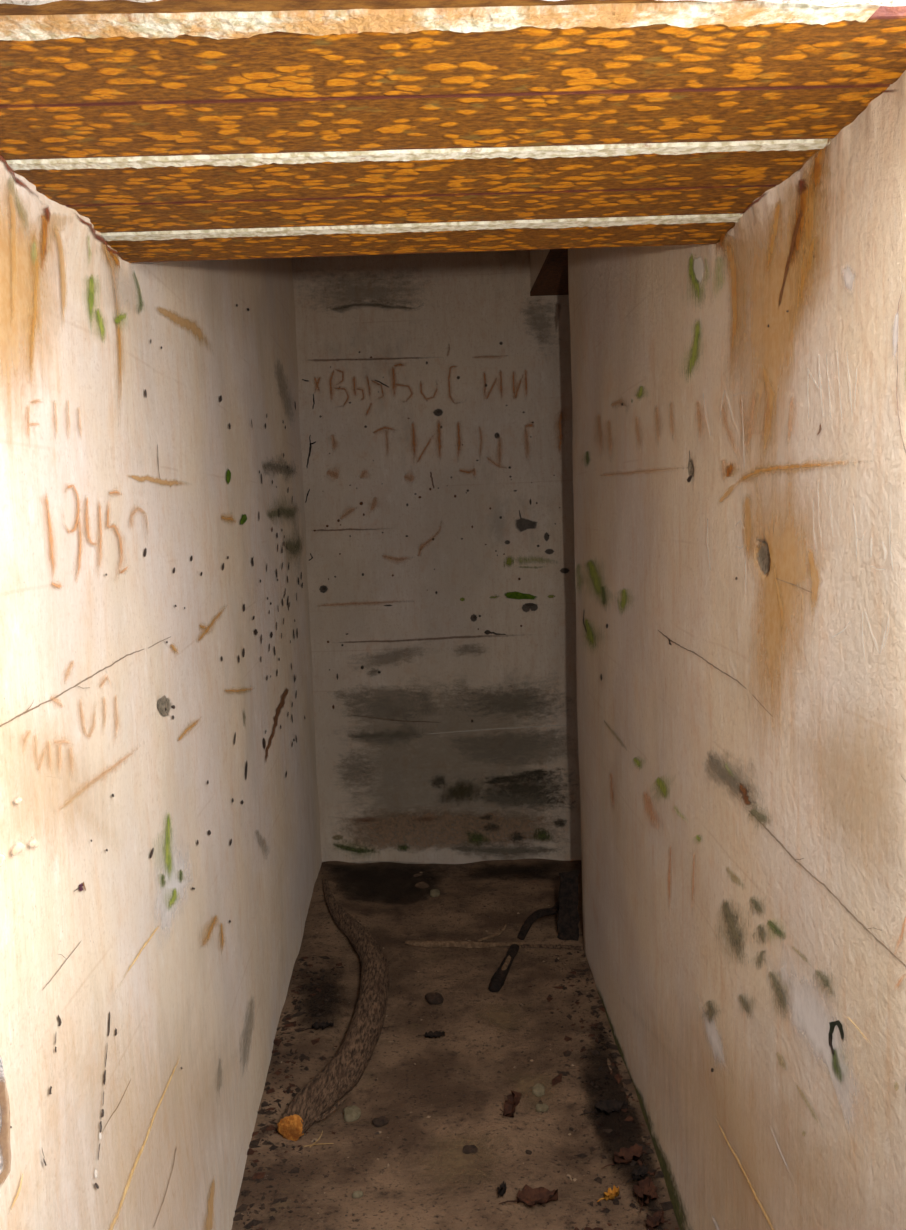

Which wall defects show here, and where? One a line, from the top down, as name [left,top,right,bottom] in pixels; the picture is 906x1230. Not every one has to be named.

damp [432,769,567,805]
spalling [0,1056,11,1184]